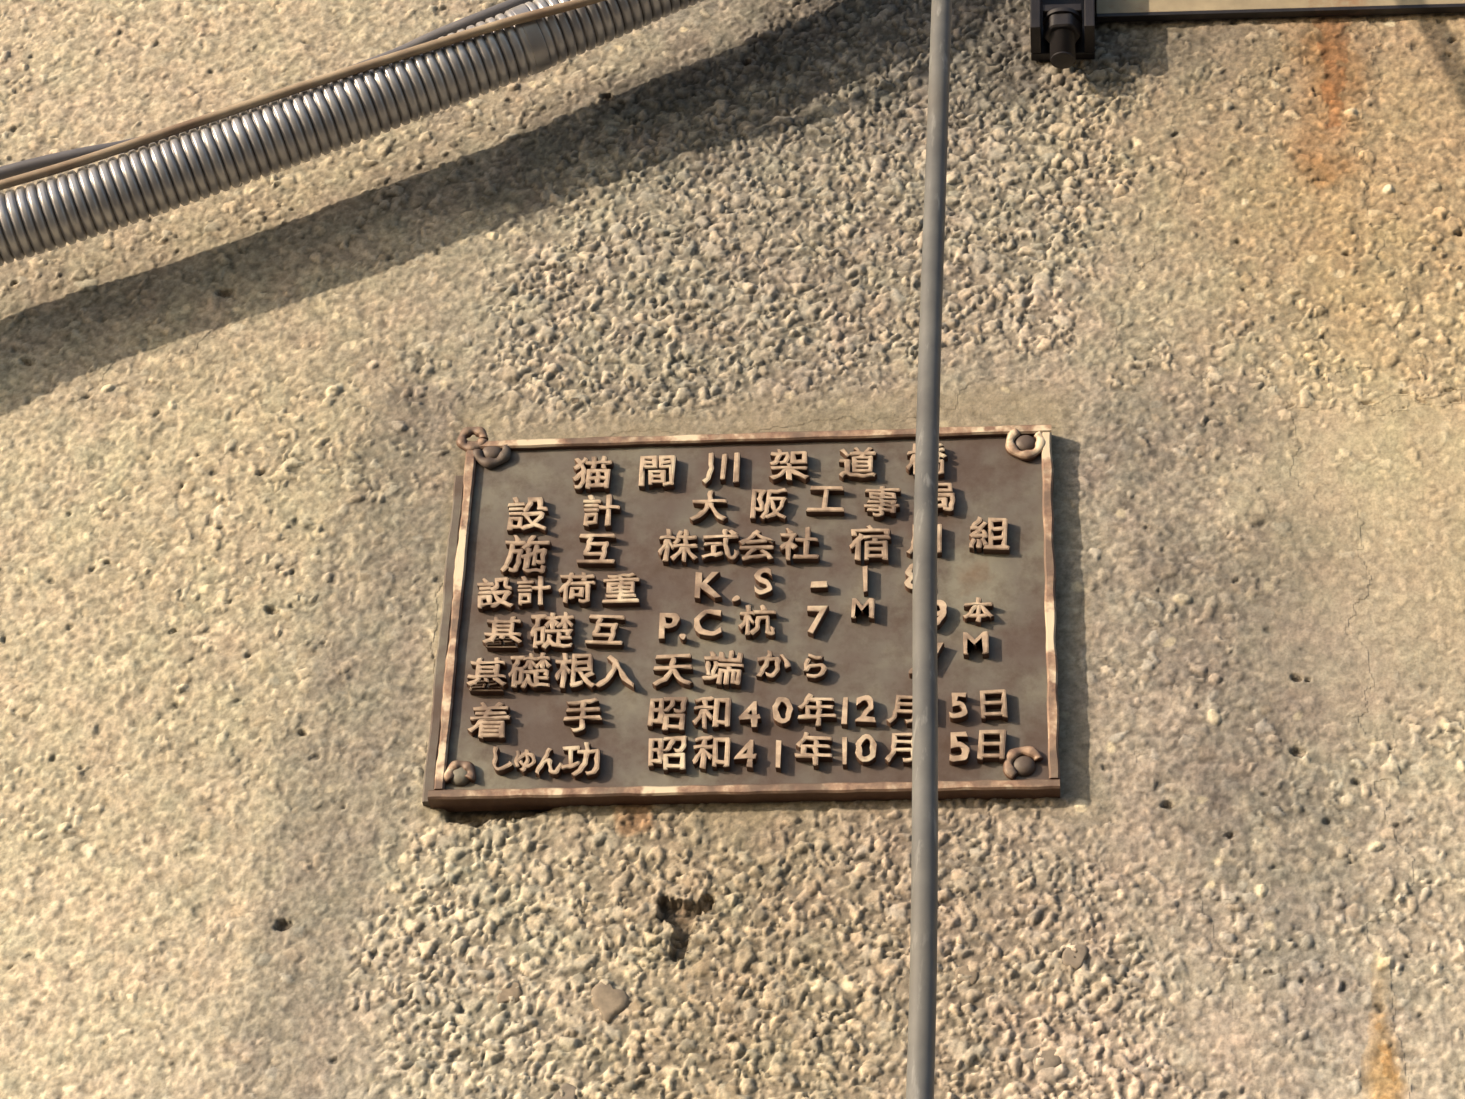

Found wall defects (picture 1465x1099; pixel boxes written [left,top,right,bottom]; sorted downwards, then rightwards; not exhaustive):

corrosion [1096,3,1465,381]
corrosion [1359,954,1411,1099]